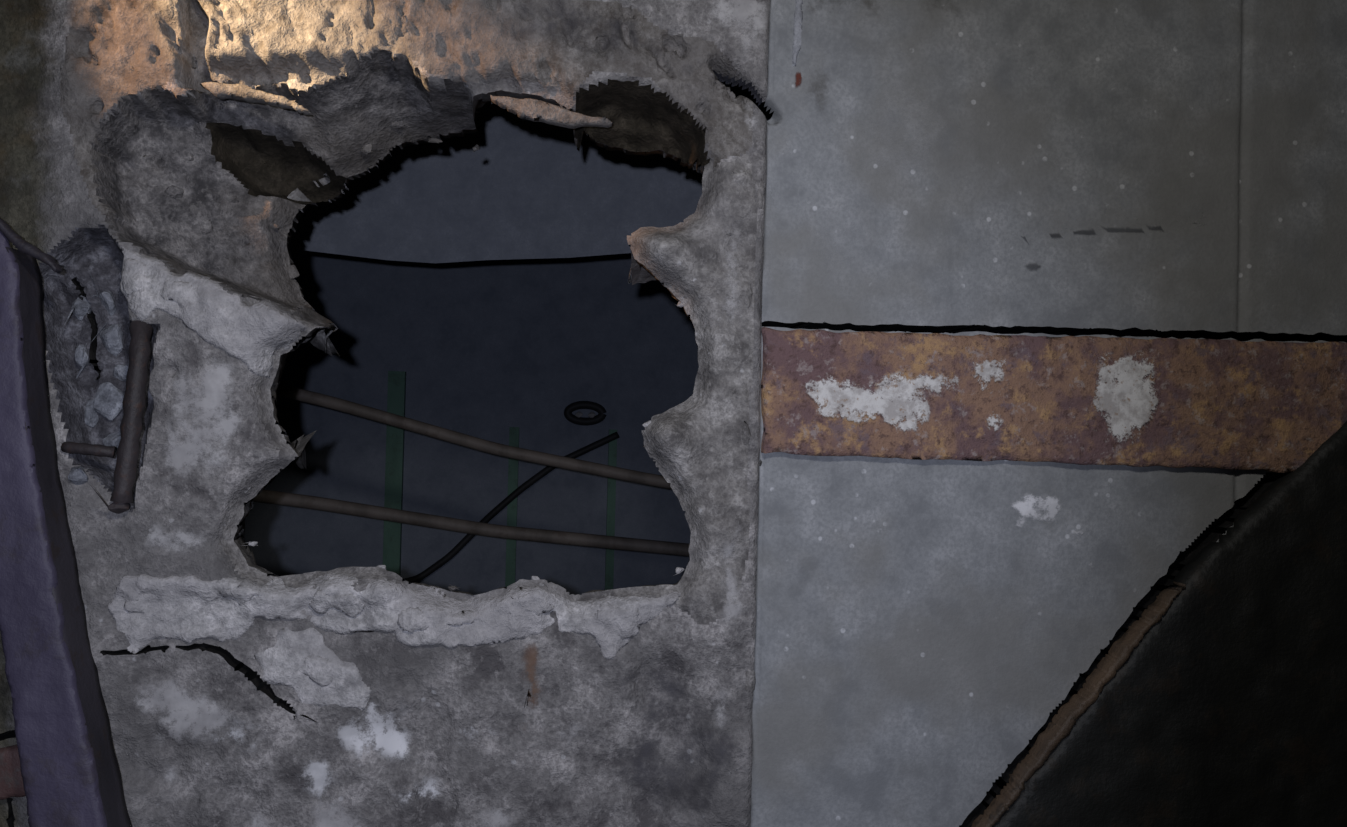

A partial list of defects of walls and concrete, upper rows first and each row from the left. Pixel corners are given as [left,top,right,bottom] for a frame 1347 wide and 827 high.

spalling [38,49,765,711]
water stain [1013,495,1060,524]
crack [100,643,313,721]
water stain [338,703,408,758]
water stain [304,762,356,827]
water stain [408,781,439,797]